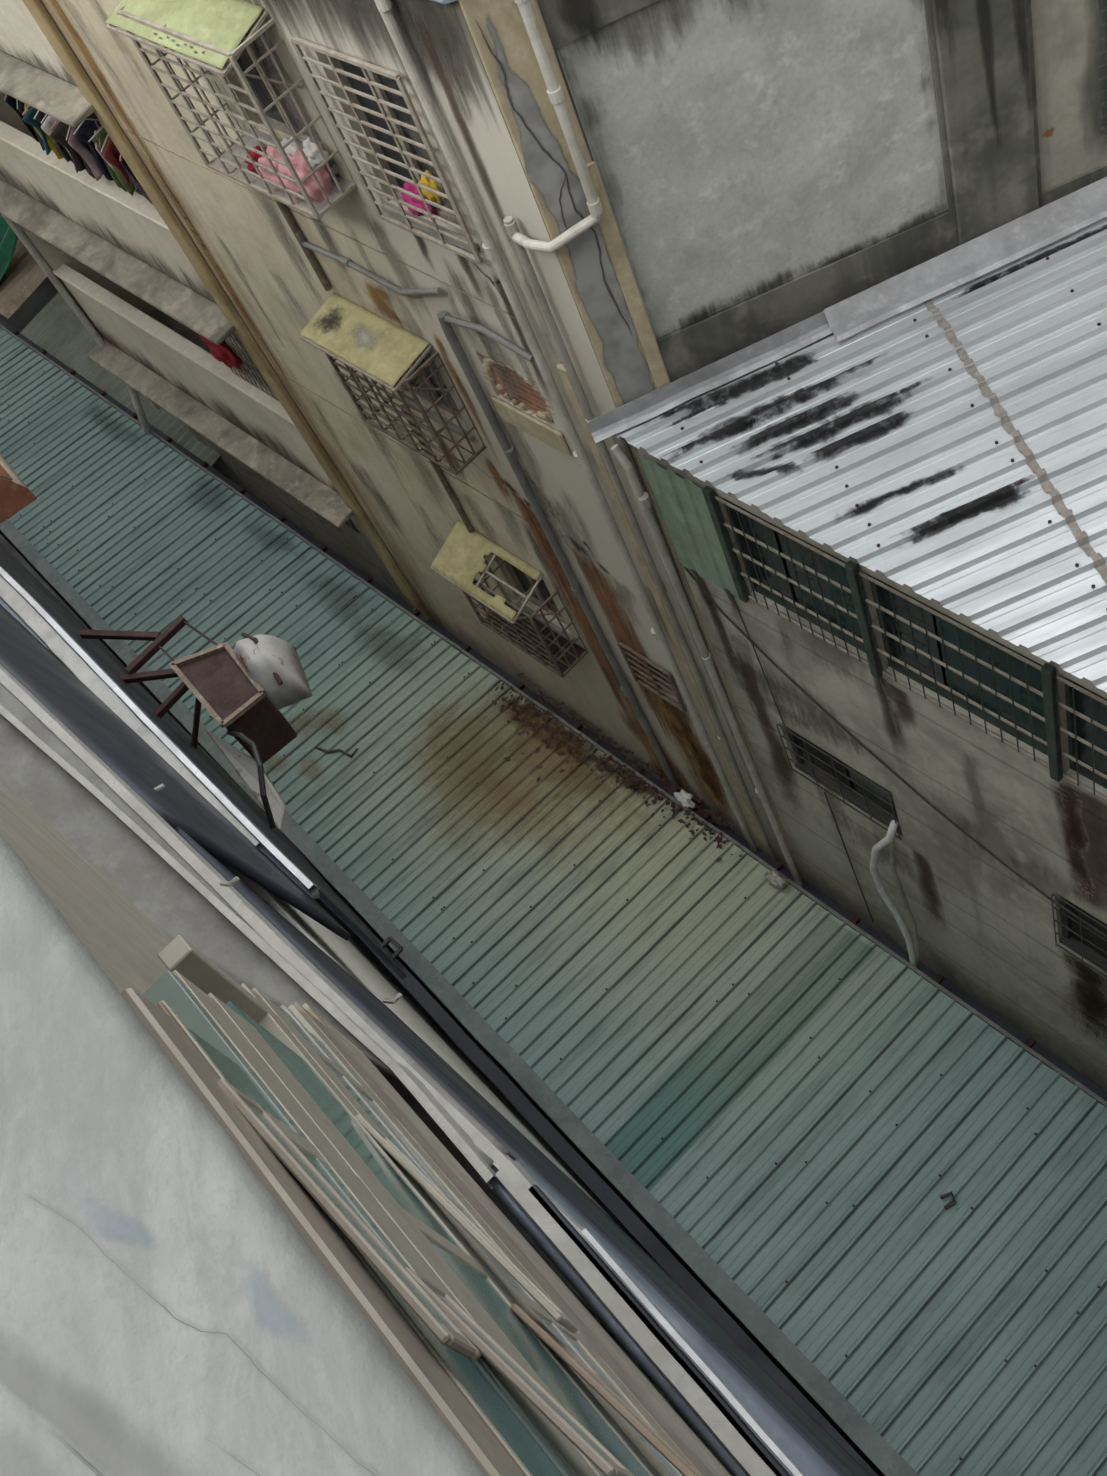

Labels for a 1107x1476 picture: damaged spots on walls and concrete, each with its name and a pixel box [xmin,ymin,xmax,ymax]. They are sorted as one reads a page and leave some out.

damp [50,0,142,143]
damp [248,0,511,241]
crack [472,21,633,337]
damp [82,161,286,379]
damp [457,254,543,385]
damp [680,272,793,329]
damp [964,224,1107,295]
damp [662,355,920,480]
damp [839,467,962,519]
damp [911,478,1029,543]
corrosion [487,460,727,813]
crack [24,1193,376,1476]